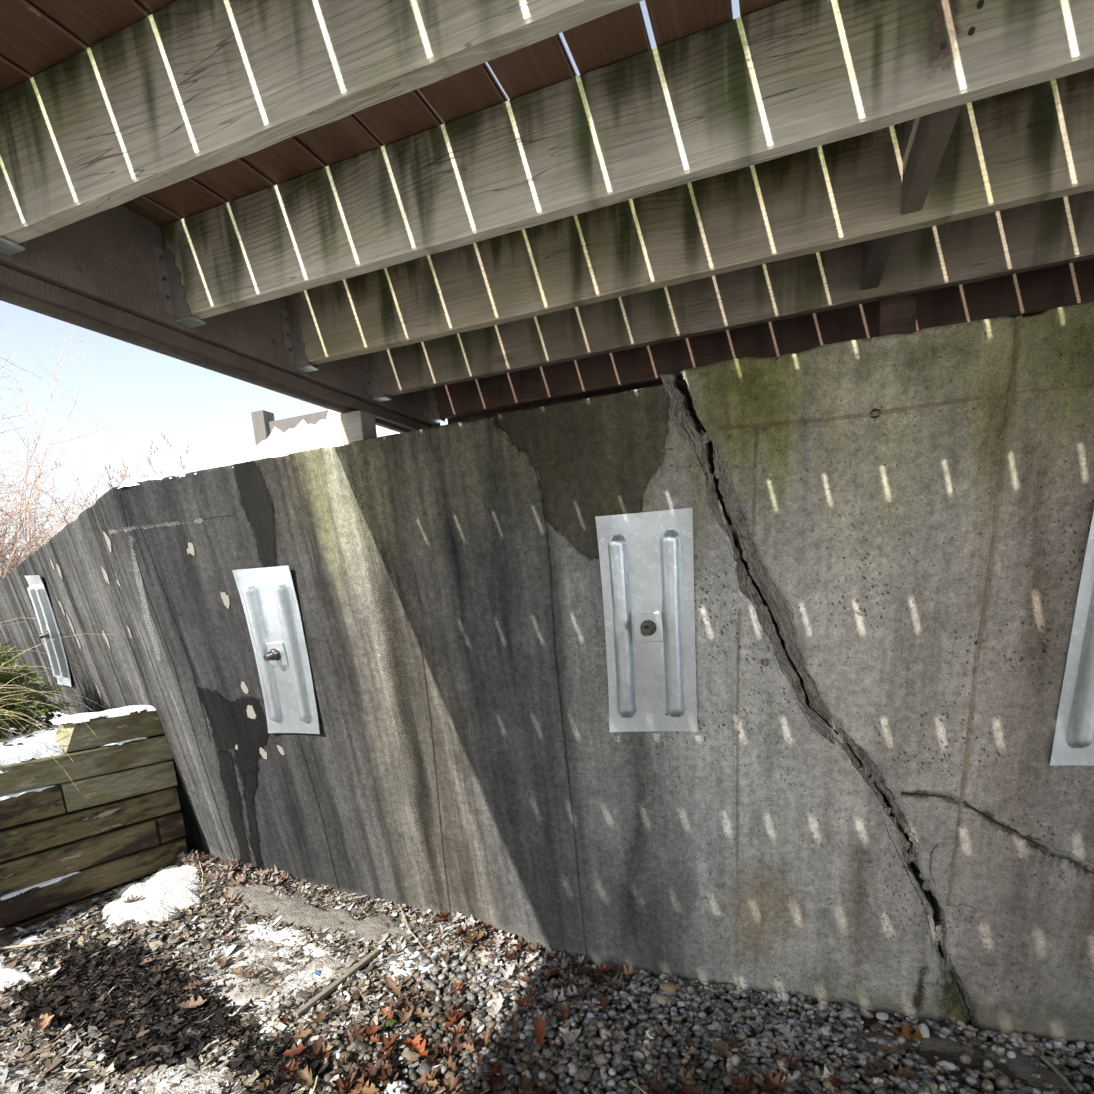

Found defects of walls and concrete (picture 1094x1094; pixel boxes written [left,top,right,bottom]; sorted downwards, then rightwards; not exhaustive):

corrosion [929,0,959,66]
damp [198,688,269,872]
crack [660,371,1094,1027]